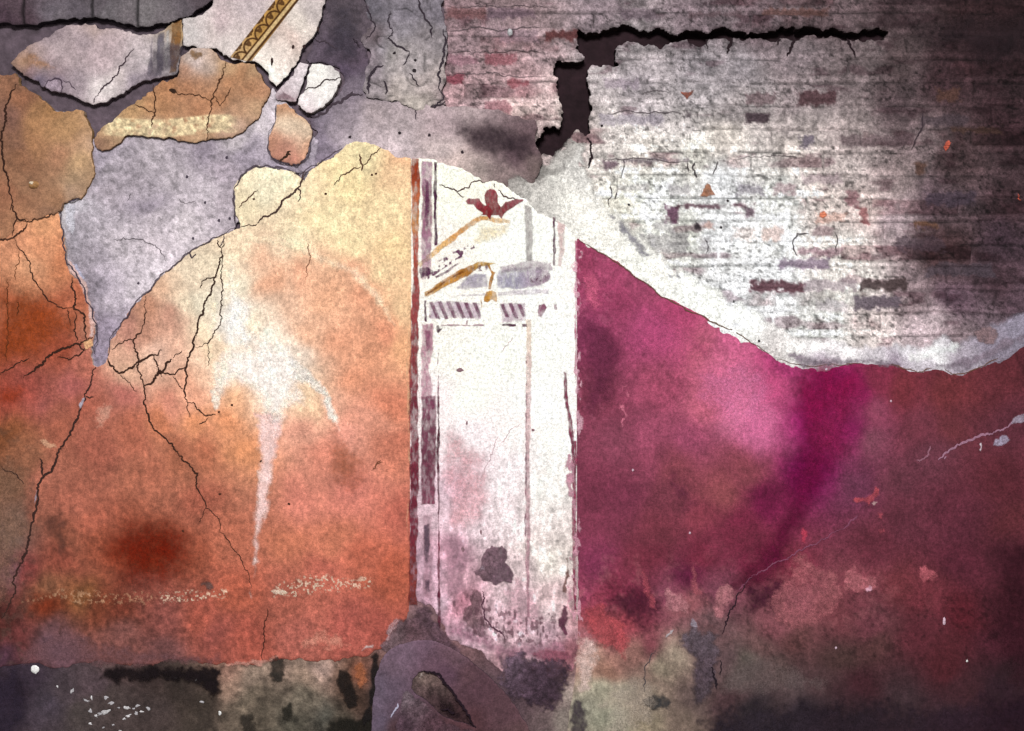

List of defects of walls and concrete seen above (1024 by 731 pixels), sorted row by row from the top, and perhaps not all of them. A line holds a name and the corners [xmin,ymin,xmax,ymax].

flaking render [61,0,884,367]
crack [0,0,554,618]
leakage [211,293,338,562]
leakage [272,576,371,595]
crack [722,578,751,634]
spalling [411,671,474,727]
leakage [644,696,671,710]
crack [711,660,722,689]
leakage [697,695,1024,731]